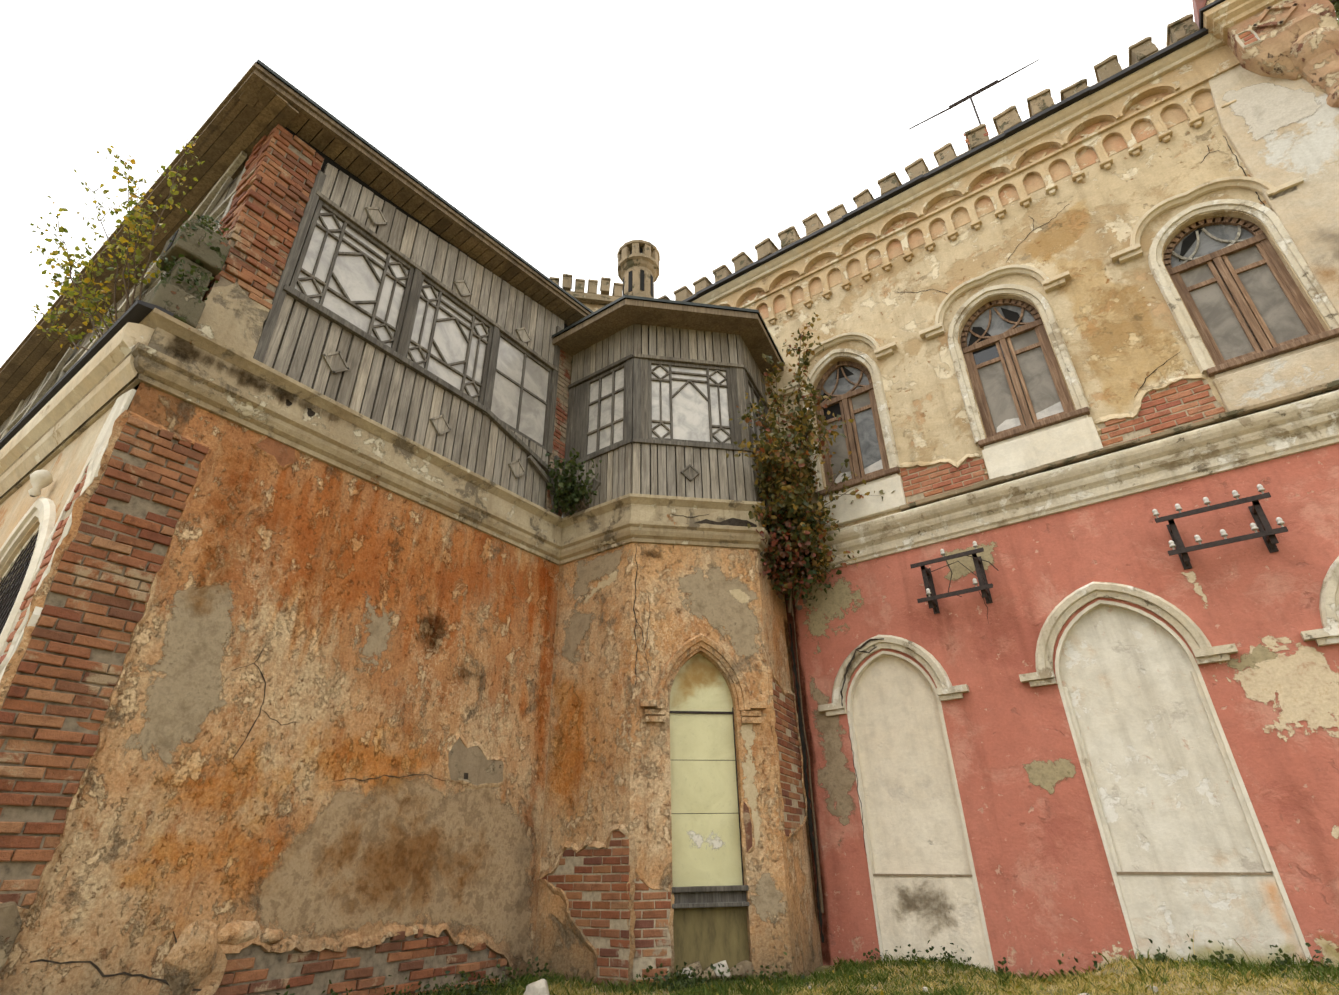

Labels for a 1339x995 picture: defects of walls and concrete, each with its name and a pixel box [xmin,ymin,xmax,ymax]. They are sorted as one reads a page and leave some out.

flaking render [1222,83,1321,141]
flaking render [1093,373,1227,448]
flaking render [898,452,989,504]
flaking render [0,410,245,918]
damp [354,594,394,672]
flaking render [678,566,864,847]
peeling [1213,635,1339,742]
damp [784,588,970,964]
flaking render [1022,758,1076,795]
flaking render [195,731,675,995]
crack [30,959,202,991]